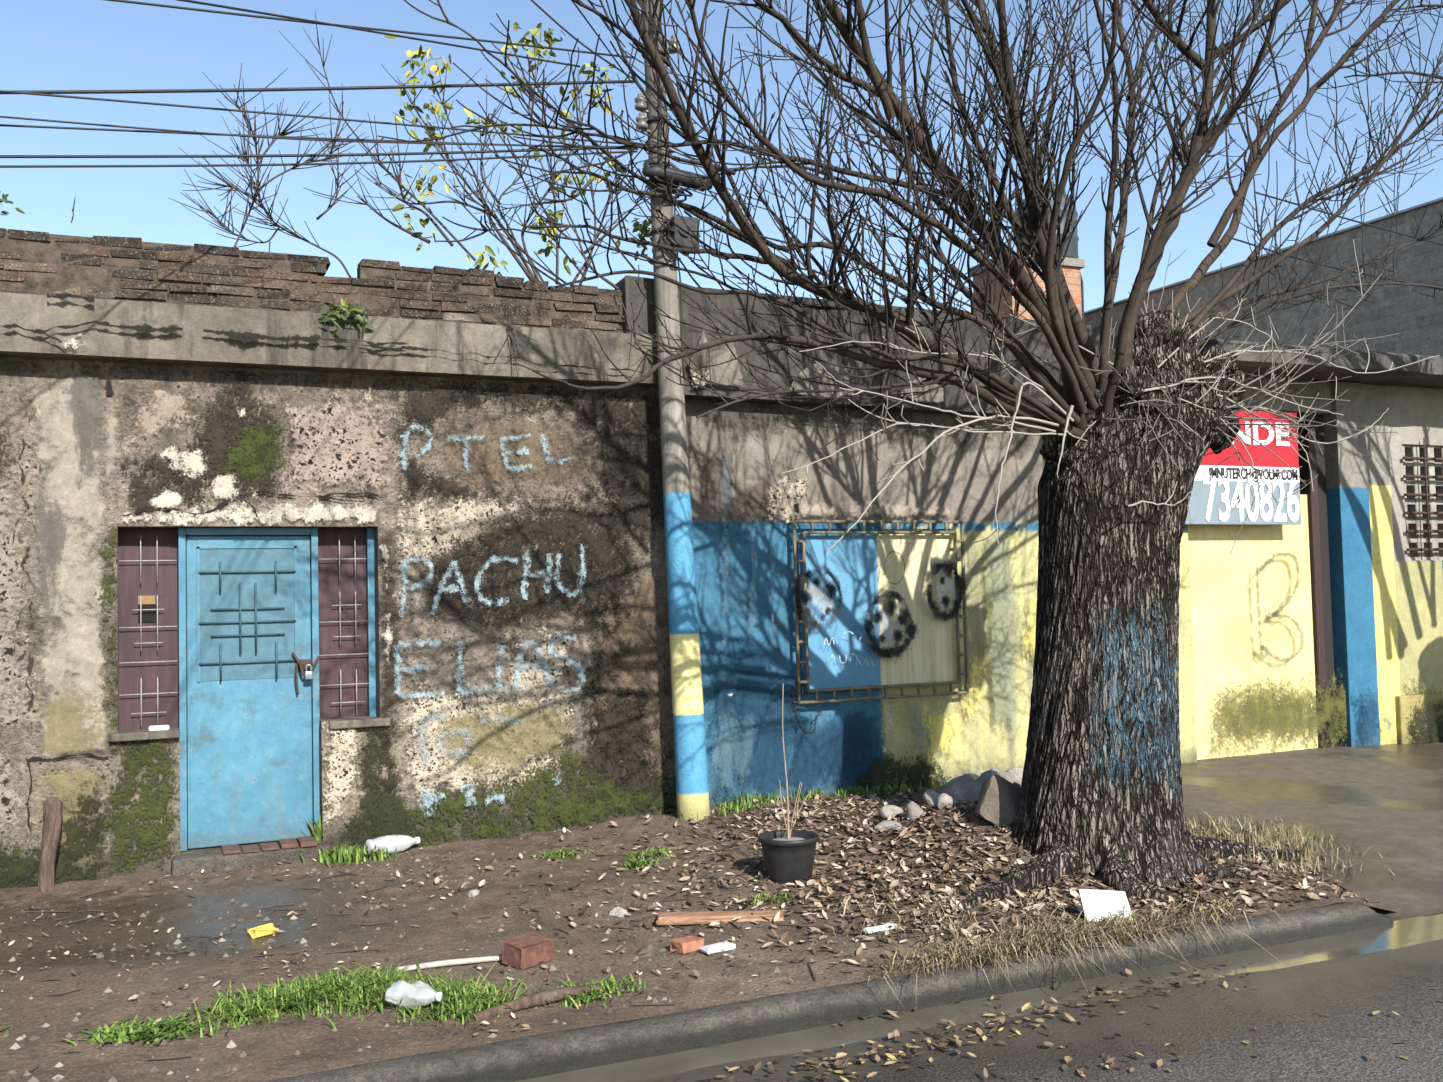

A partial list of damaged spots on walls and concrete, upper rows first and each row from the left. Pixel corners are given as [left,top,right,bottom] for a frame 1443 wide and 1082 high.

crack [1,292,643,373]
peeling [125,390,195,452]
peeling [151,490,182,508]
peeling [161,446,206,479]
leakage [70,365,351,520]
peeling [702,452,777,521]
flaking render [798,502,966,518]
leakage [372,378,676,816]
leakage [0,774,116,889]